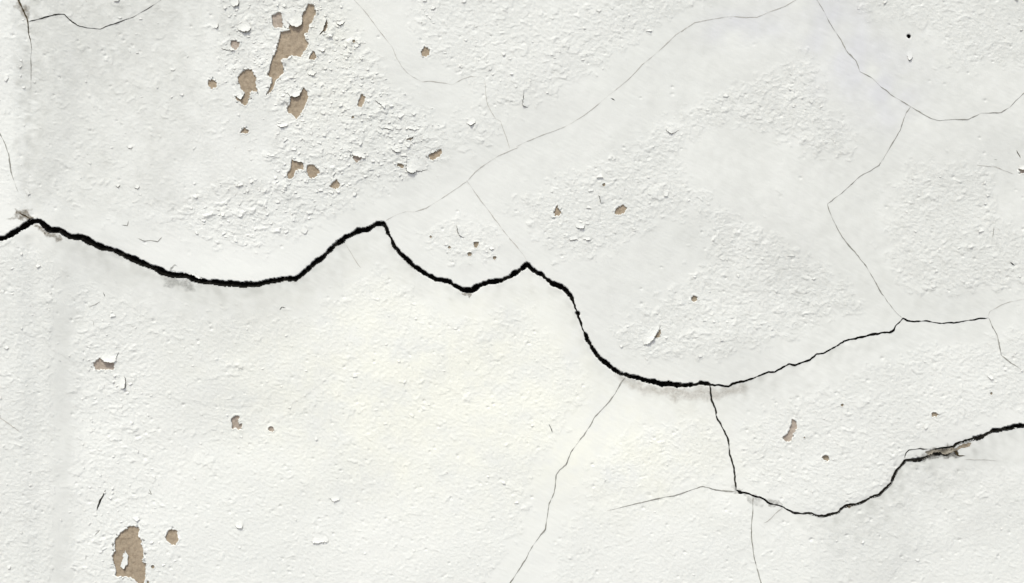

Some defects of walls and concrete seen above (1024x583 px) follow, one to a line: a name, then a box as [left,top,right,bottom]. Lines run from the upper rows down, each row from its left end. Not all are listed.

crack [18,0,158,51]
crack [356,2,474,85]
crack [577,1,794,120]
crack [818,2,872,78]
peeling [190,0,447,247]
crack [485,85,564,157]
crack [851,86,979,185]
peeling [57,346,152,427]
crack [0,161,1024,583]
peeling [781,411,807,445]
peeling [60,466,182,583]